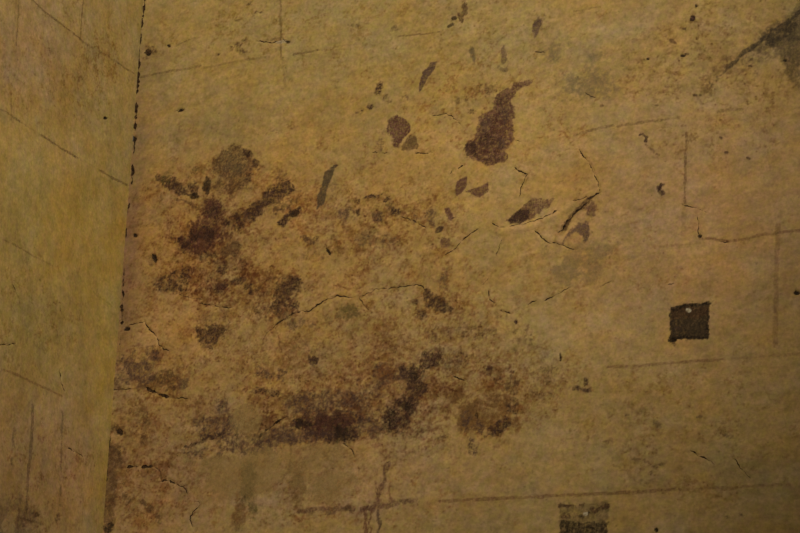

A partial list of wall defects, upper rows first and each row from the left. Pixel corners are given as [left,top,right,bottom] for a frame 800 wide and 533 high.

leakage [157,145,259,199]
leakage [224,181,301,230]
leakage [317,165,337,209]
leakage [340,194,401,221]
leakage [456,177,488,197]
crack [445,149,600,255]
leakage [509,198,552,223]
leakage [270,276,303,318]
crack [268,284,425,332]
leakage [413,289,453,317]
leakage [196,325,225,349]
leakage [184,353,440,456]